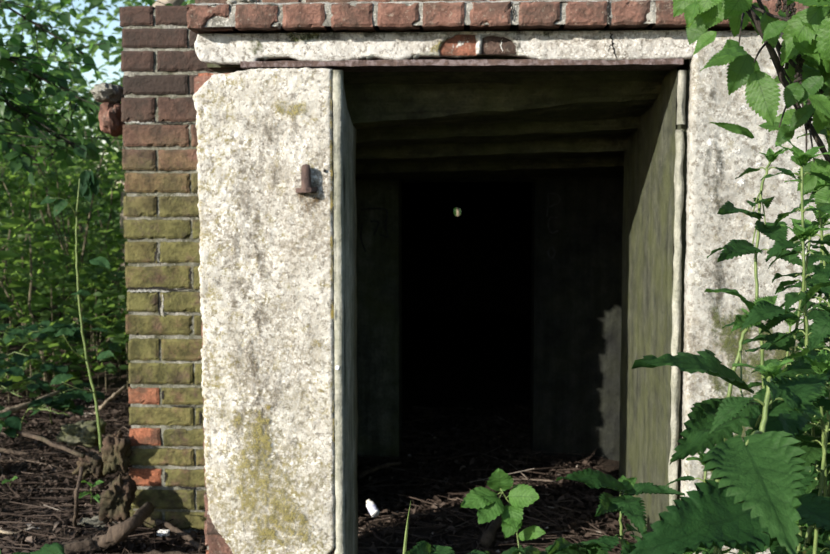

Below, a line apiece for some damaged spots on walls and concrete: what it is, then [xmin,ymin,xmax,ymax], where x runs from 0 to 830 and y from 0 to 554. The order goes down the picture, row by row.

crack [607,0,617,58]
spalling [207,511,233,554]